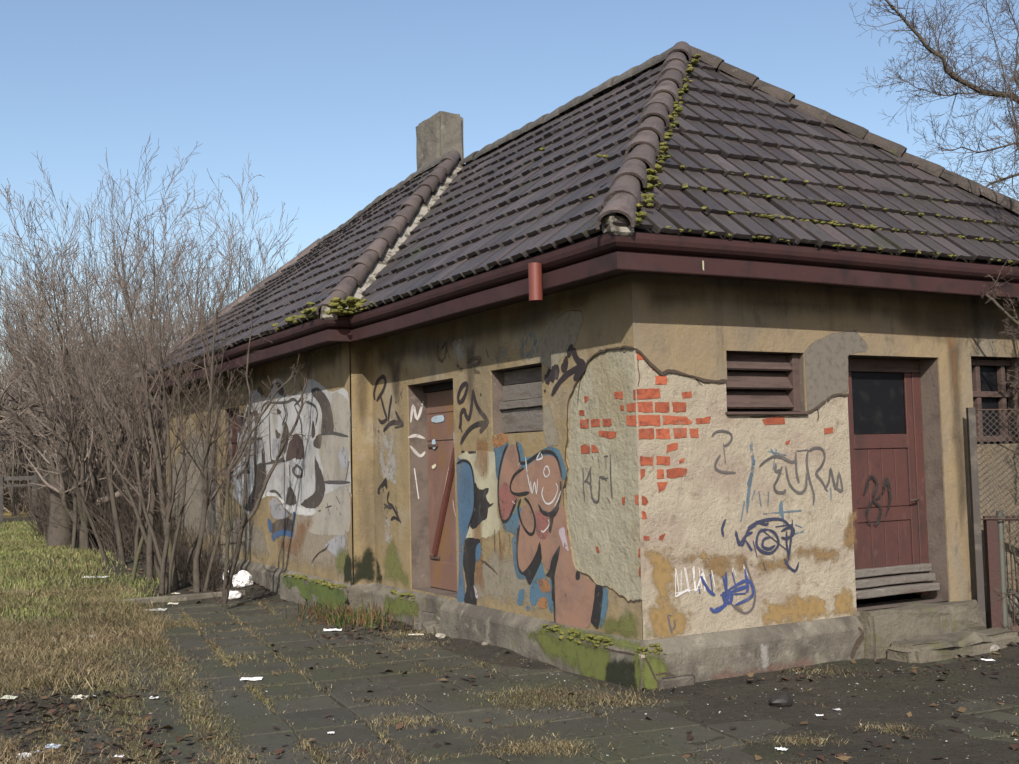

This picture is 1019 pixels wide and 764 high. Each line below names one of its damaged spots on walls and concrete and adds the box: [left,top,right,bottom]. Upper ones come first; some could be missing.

flaking render [565,348,857,640]
water stain [605,660,637,689]
spalling [657,674,696,689]